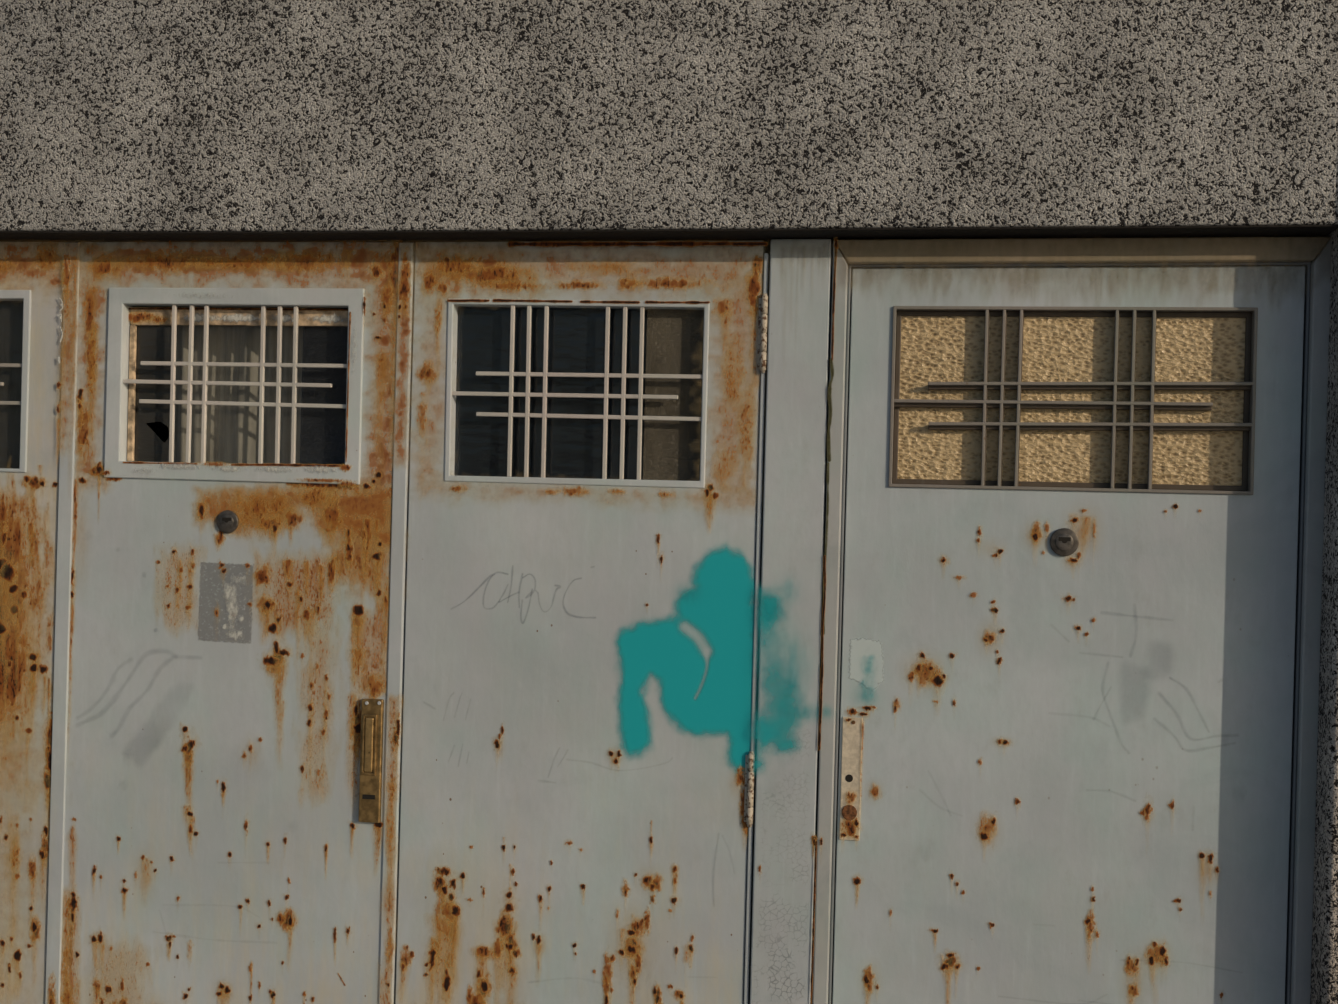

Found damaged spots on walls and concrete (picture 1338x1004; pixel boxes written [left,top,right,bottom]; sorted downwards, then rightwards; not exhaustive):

corrosion [0,240,768,1004]
corrosion [818,555,826,750]
corrosion [908,652,956,706]
corrosion [983,629,1005,665]
corrosion [841,818,859,839]
corrosion [979,817,996,841]
corrosion [1140,803,1153,822]
corrosion [810,836,823,1004]
corrosion [1085,887,1099,938]
corrosion [864,966,879,991]
corrosion [931,929,960,1002]
corrosion [1125,942,1169,996]